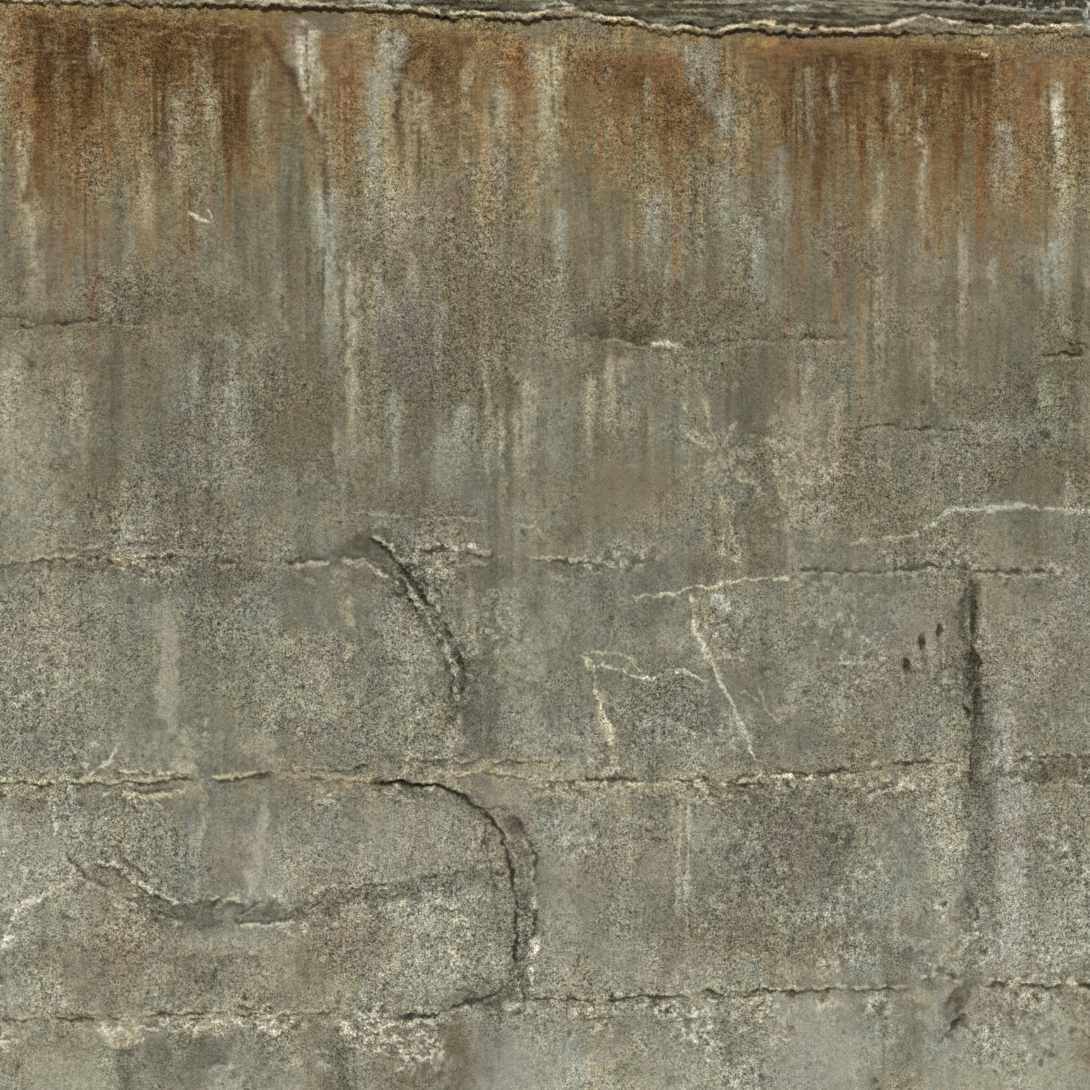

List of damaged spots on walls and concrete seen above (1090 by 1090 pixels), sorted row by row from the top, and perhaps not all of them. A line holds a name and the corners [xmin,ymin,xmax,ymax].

rust [0,2,374,311]
water stain [0,25,459,755]
rust [391,24,543,287]
water stain [423,35,864,578]
rust [551,34,1090,448]
water stain [859,154,895,385]
water stain [881,72,934,213]
water stain [455,622,510,761]
crack [0,412,1090,1047]